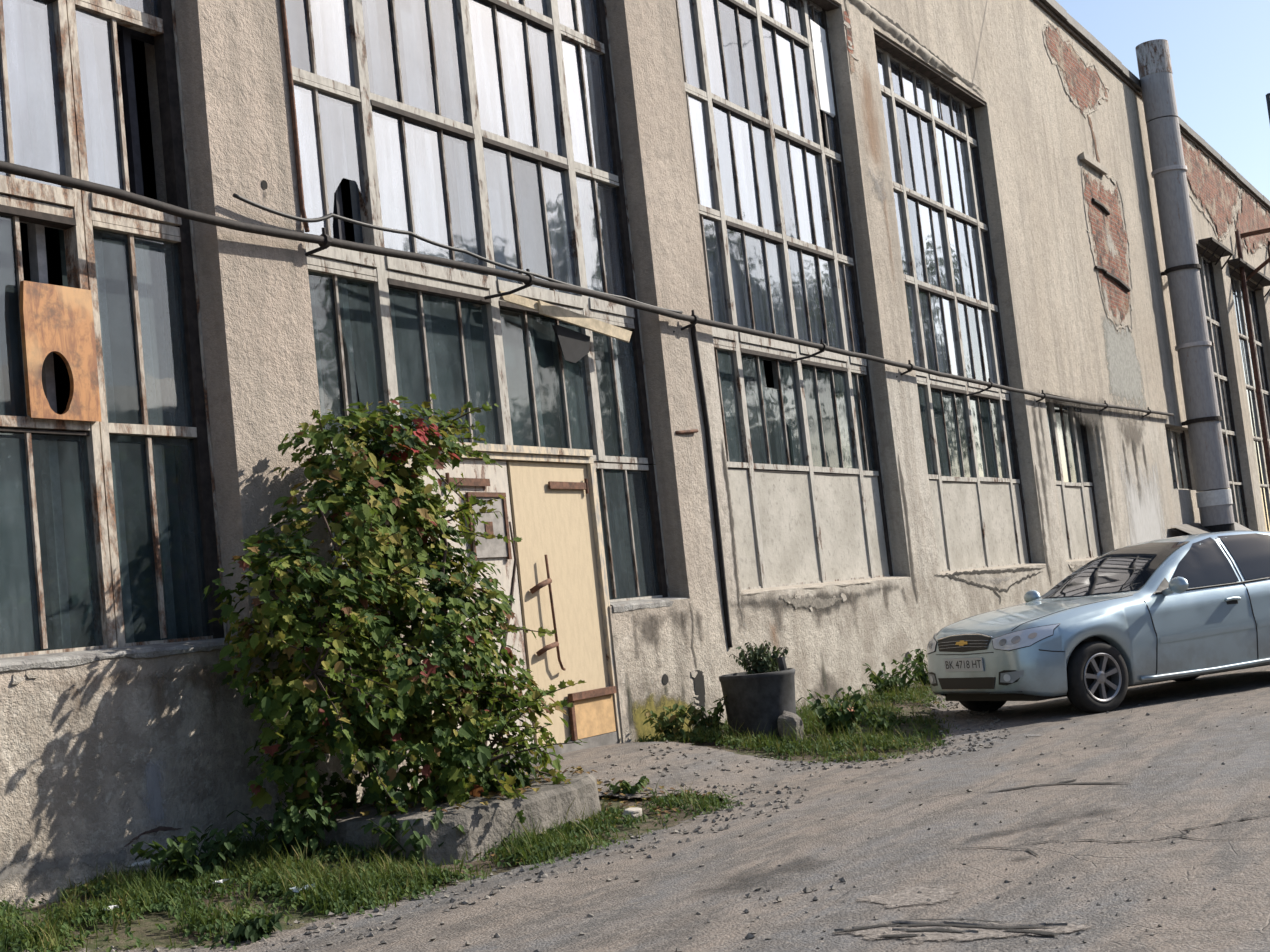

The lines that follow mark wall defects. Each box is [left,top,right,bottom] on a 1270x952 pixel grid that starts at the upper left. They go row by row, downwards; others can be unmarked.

spalling [843,10,859,74]
spalling [1042,20,1110,119]
spalling [1079,151,1134,333]
spalling [1180,132,1270,254]
crack [934,567,1045,603]